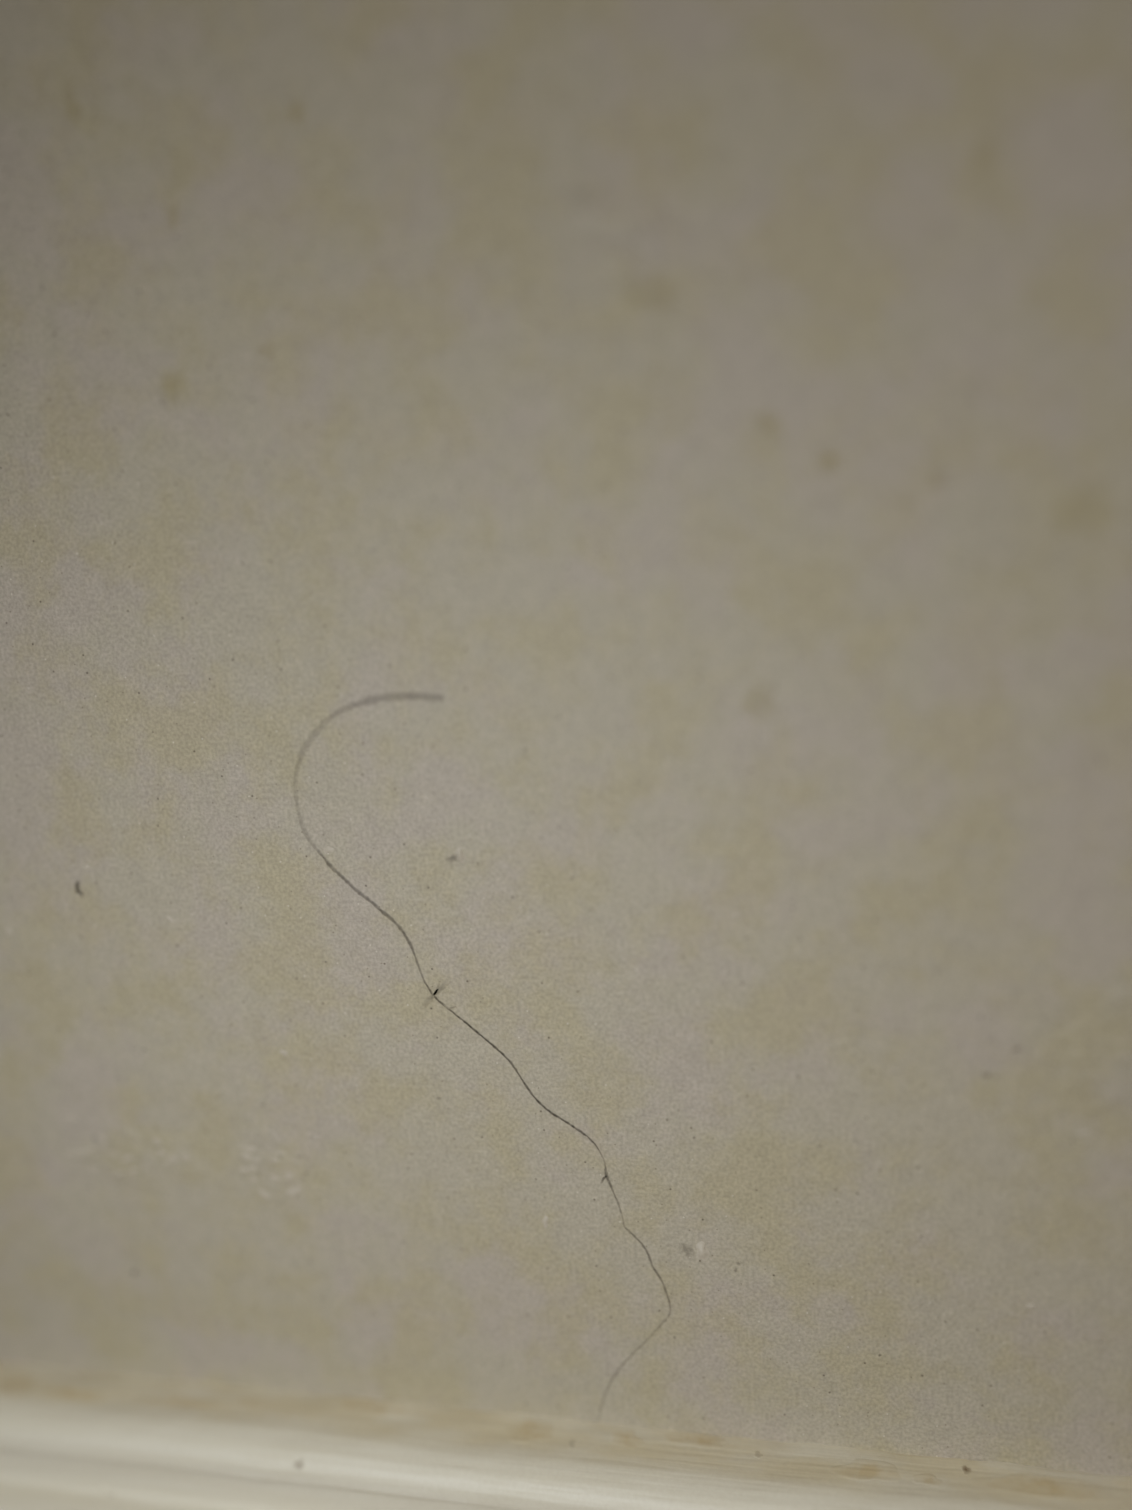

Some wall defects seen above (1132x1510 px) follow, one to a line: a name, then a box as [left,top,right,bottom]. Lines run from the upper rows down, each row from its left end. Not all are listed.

crack [293,691,671,1422]